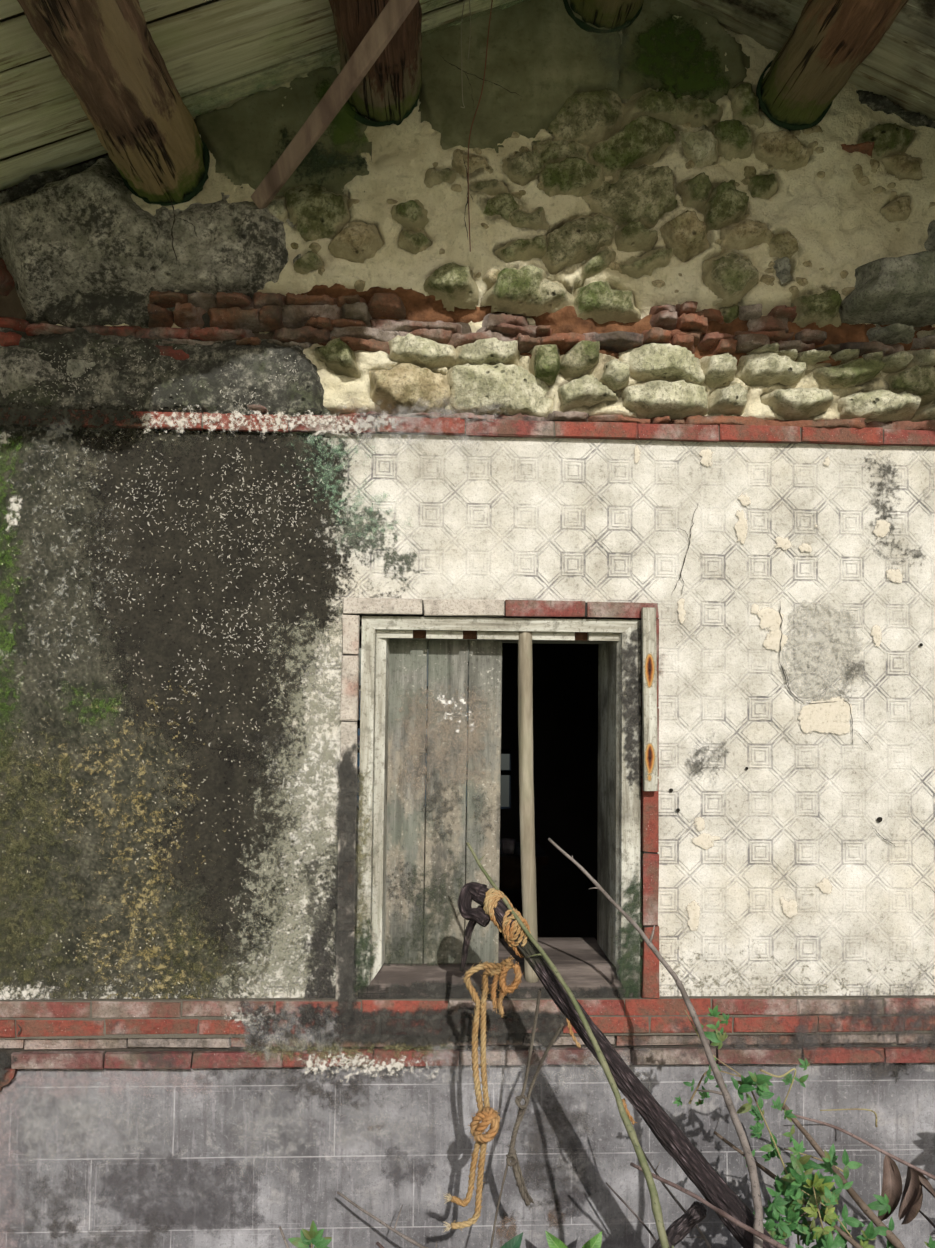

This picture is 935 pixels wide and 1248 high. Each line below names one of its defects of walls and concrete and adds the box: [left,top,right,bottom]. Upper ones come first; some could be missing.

peeling [699,448,713,466]
peeling [873,520,890,538]
water stain [865,454,925,564]
peeling [751,604,788,652]
corrosion [645,654,661,688]
water stain [840,657,868,700]
peeling [798,696,852,735]
water stain [0,405,568,1096]
corrosion [645,743,655,781]
water stain [686,741,730,783]
water stain [570,985,641,998]
water stain [660,943,935,1082]